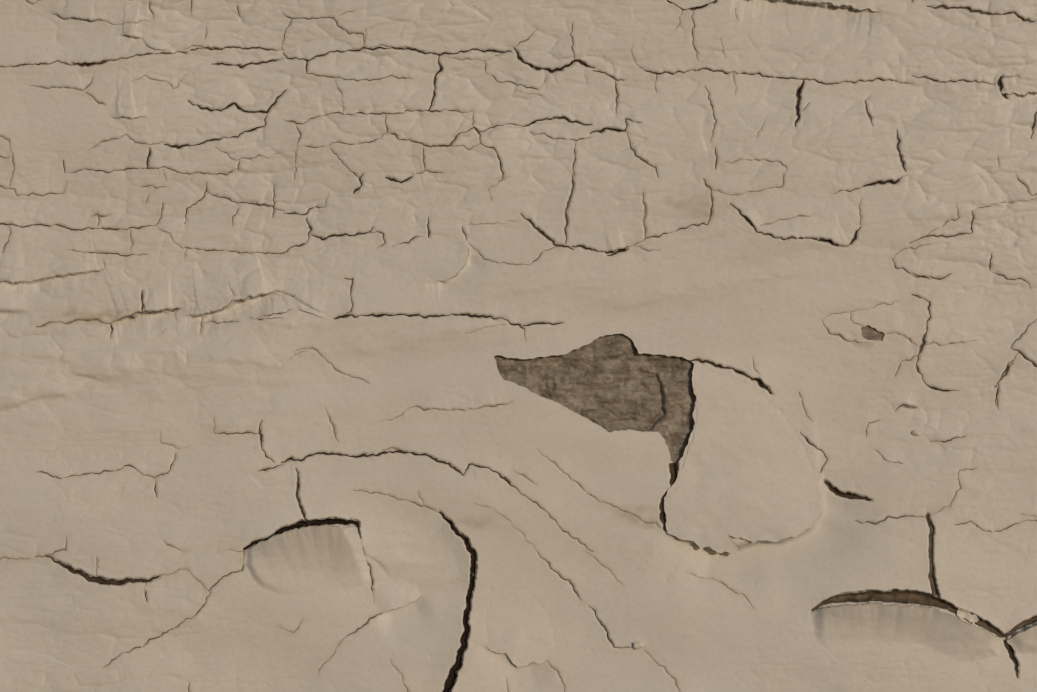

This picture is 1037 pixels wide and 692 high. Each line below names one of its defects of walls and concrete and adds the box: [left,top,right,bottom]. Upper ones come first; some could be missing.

crack [0,0,1035,283]
crack [36,284,297,338]
crack [0,408,623,692]
crack [377,402,511,422]
crack [334,278,563,342]
crack [477,504,680,691]
crack [538,450,677,530]
peeling [494,334,821,555]
crack [690,359,772,394]
crack [799,392,1037,678]
crack [822,178,1037,464]